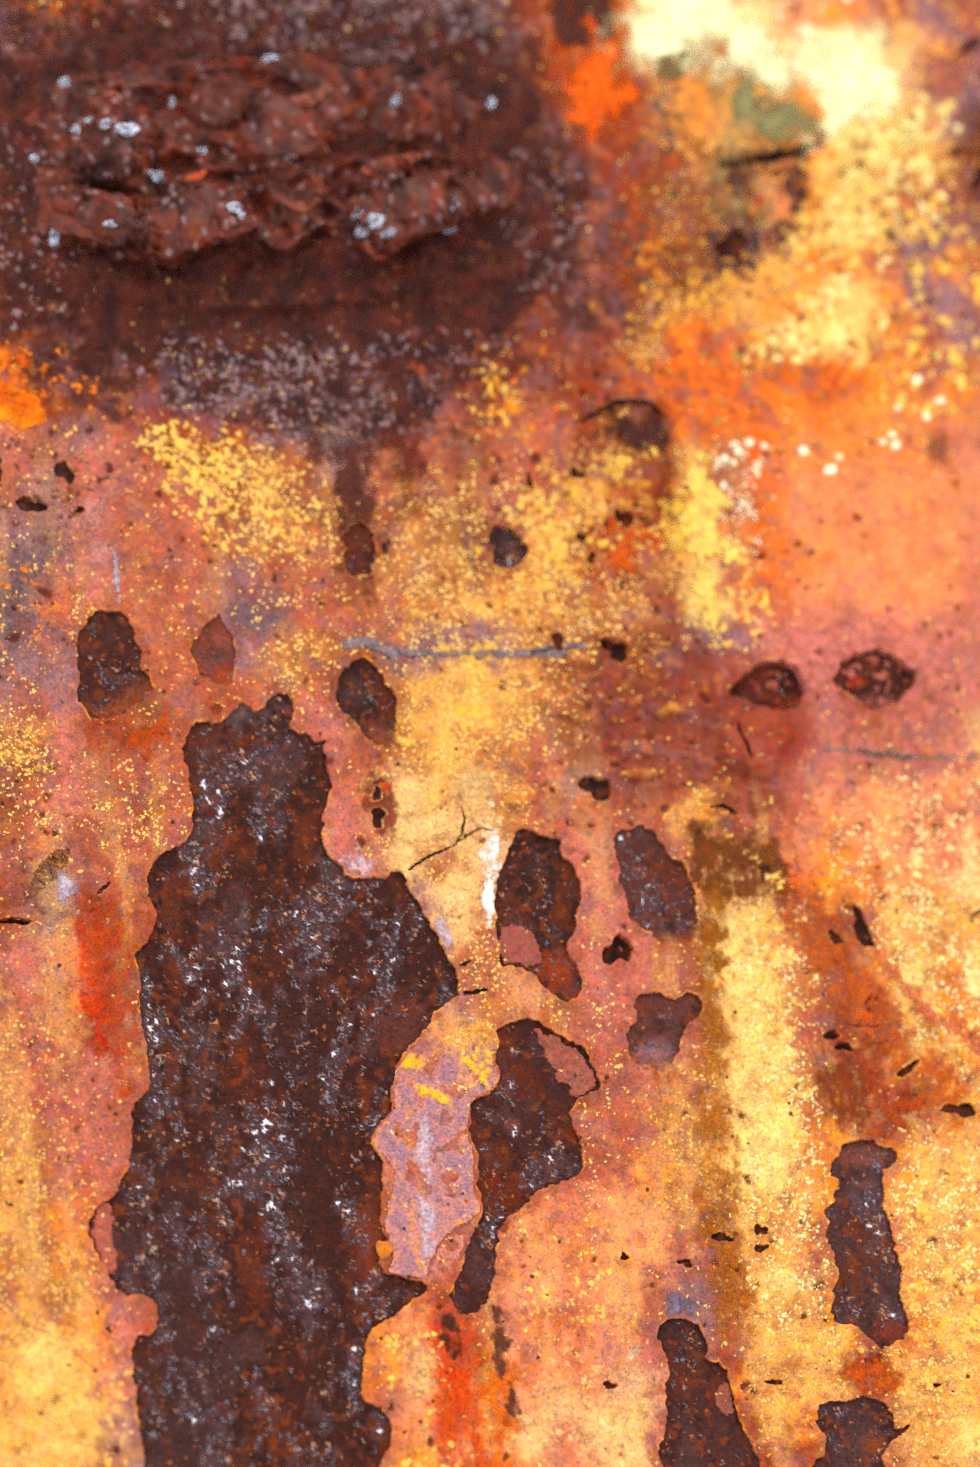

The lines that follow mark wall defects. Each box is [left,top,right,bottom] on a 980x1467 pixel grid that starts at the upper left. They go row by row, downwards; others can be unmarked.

corrosion [0,0,639,553]
corrosion [649,146,809,294]
corrosion [603,407,689,575]
corrosion [362,772,397,837]
spalling [0,911,38,931]
peeling [71,604,708,1467]
corrosion [686,821,980,1338]
peeling [819,1134,915,1355]
corrosion [433,1305,522,1467]
peeling [652,1312,766,1467]
peeling [805,1390,915,1467]
corrosion [841,1352,903,1399]